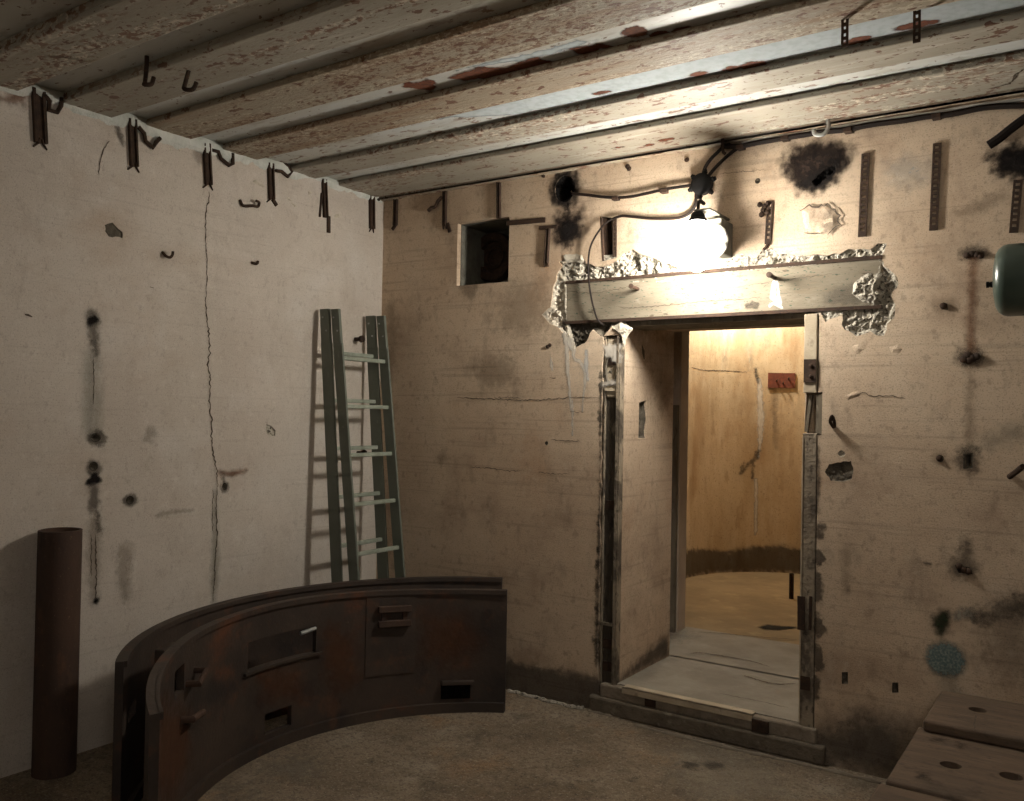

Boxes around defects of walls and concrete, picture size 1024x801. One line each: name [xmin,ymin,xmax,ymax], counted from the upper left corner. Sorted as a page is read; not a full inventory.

corrosion [621,25,691,38]
corrosion [402,57,553,92]
flaking render [105,223,122,238]
spalling [542,243,898,348]
crack [205,194,218,593]
efflorescence [563,332,589,435]
flaking render [816,448,854,495]
damp [90,534,99,604]
spalling [813,524,826,700]